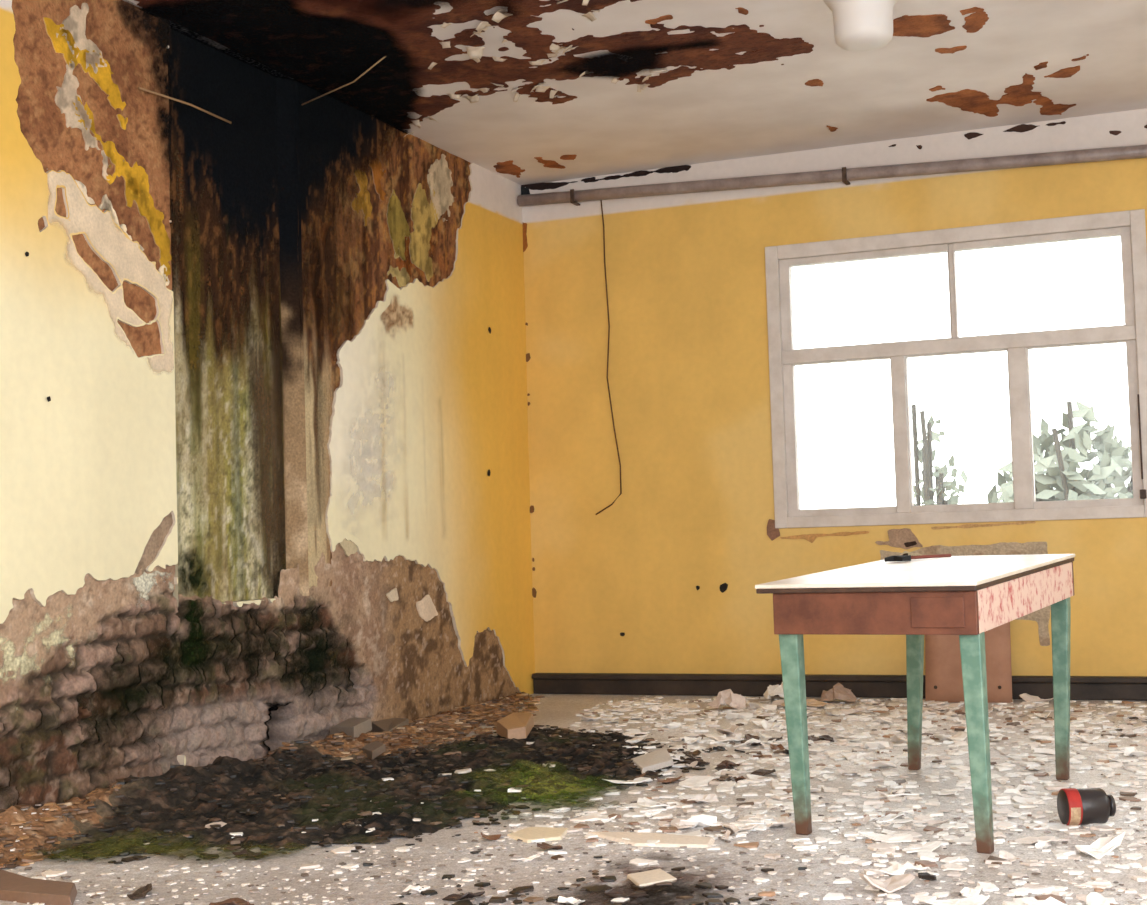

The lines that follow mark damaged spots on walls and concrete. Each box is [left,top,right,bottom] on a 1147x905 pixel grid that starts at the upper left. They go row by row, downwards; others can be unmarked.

peeling [893,7,989,54]
peeling [805,79,824,87]
peeling [926,54,1089,117]
leakage [119,1,400,600]
leakage [382,298,412,331]
spalling [0,0,814,809]
leakage [0,614,74,681]
leakage [38,599,350,749]